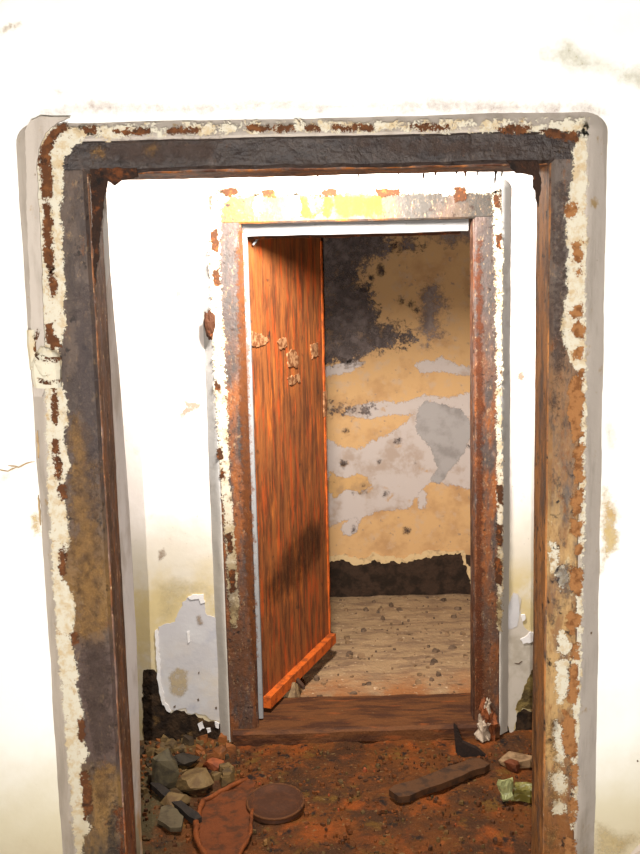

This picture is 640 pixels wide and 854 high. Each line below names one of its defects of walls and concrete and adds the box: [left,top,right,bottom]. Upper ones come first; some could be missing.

corrosion [37,122,98,298]
corrosion [90,167,139,286]
peeling [325,360,365,378]
mould [321,236,446,368]
peeling [414,355,470,376]
mould [441,221,470,250]
corrosion [51,438,68,501]
corrosion [224,229,461,658]
peeling [327,392,470,536]
corrosion [566,302,586,596]
peeling [142,594,221,741]
corrosion [547,610,582,854]